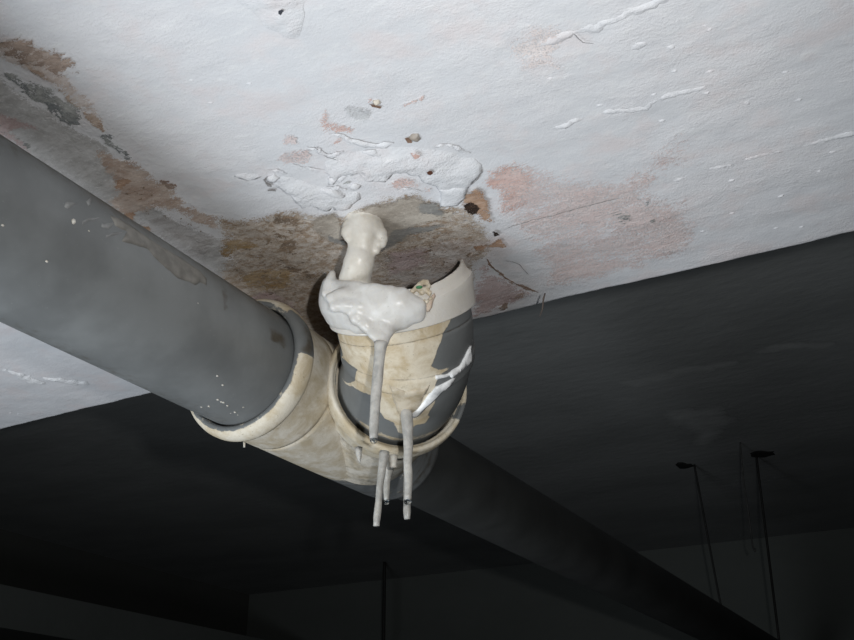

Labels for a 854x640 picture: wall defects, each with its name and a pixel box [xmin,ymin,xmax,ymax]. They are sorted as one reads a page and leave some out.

leakage [0,72,532,444]
peeling [234,133,483,212]